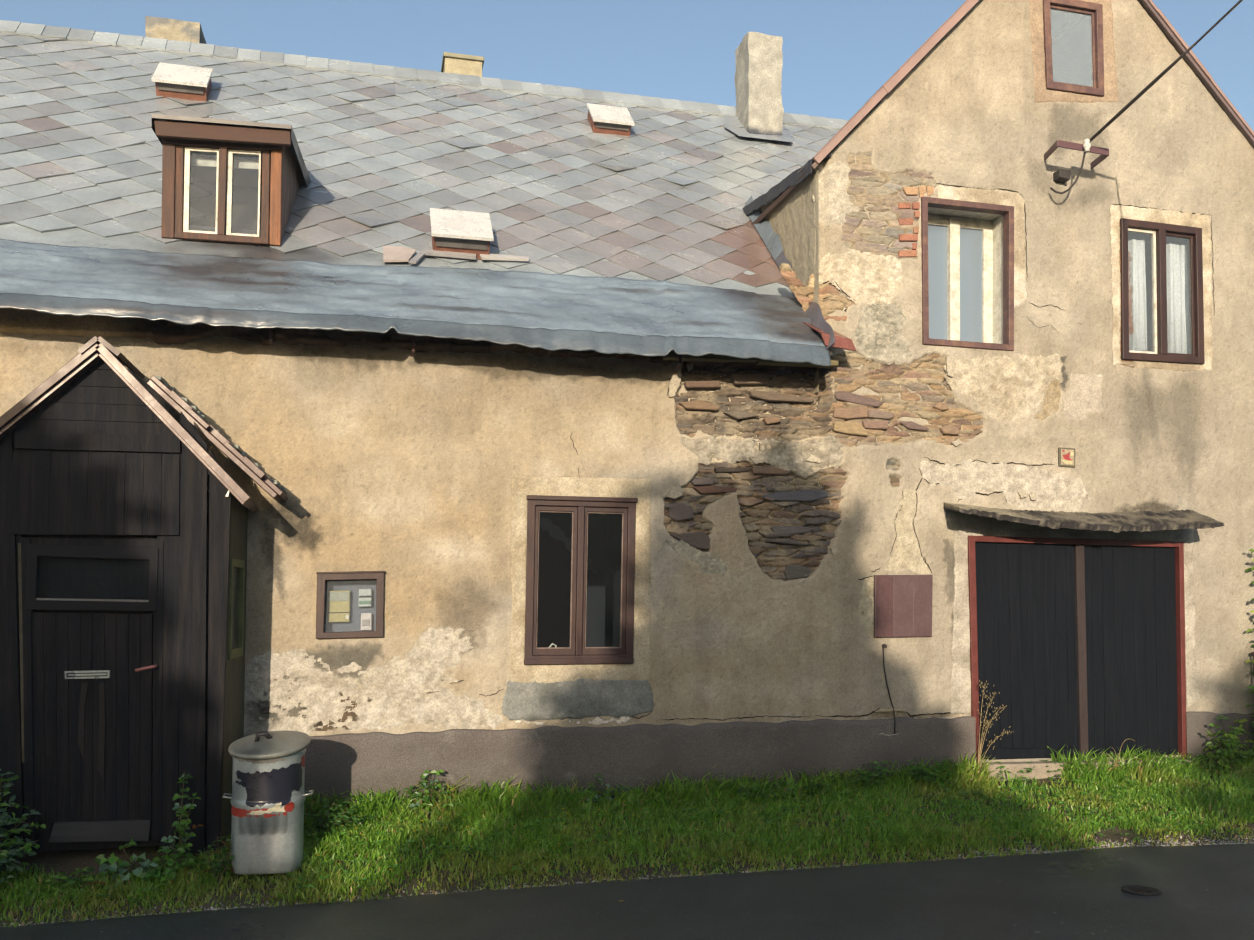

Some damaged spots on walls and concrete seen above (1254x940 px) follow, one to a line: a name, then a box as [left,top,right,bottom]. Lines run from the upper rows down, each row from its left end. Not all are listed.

flaking render [664,153,1063,581]
damp [265,504,320,585]
crack [857,457,1054,580]
peeling [860,459,1091,640]
peeling [244,626,509,736]